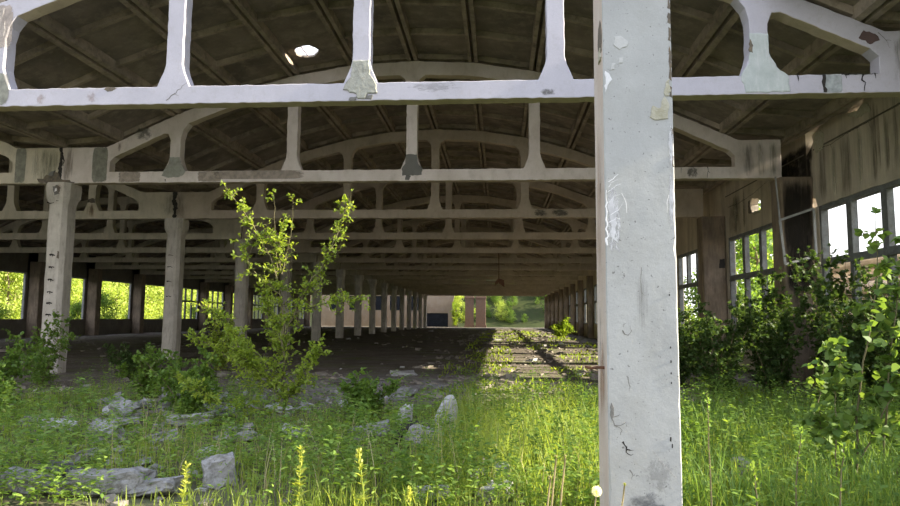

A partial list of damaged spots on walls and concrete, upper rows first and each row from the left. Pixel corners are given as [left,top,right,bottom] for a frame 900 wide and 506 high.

spalling [343,60,377,101]
spalling [598,21,628,92]
spalling [741,33,790,93]
spalling [859,30,880,44]
crack [57,148,65,178]
spalling [402,154,422,180]
crack [601,404,635,480]